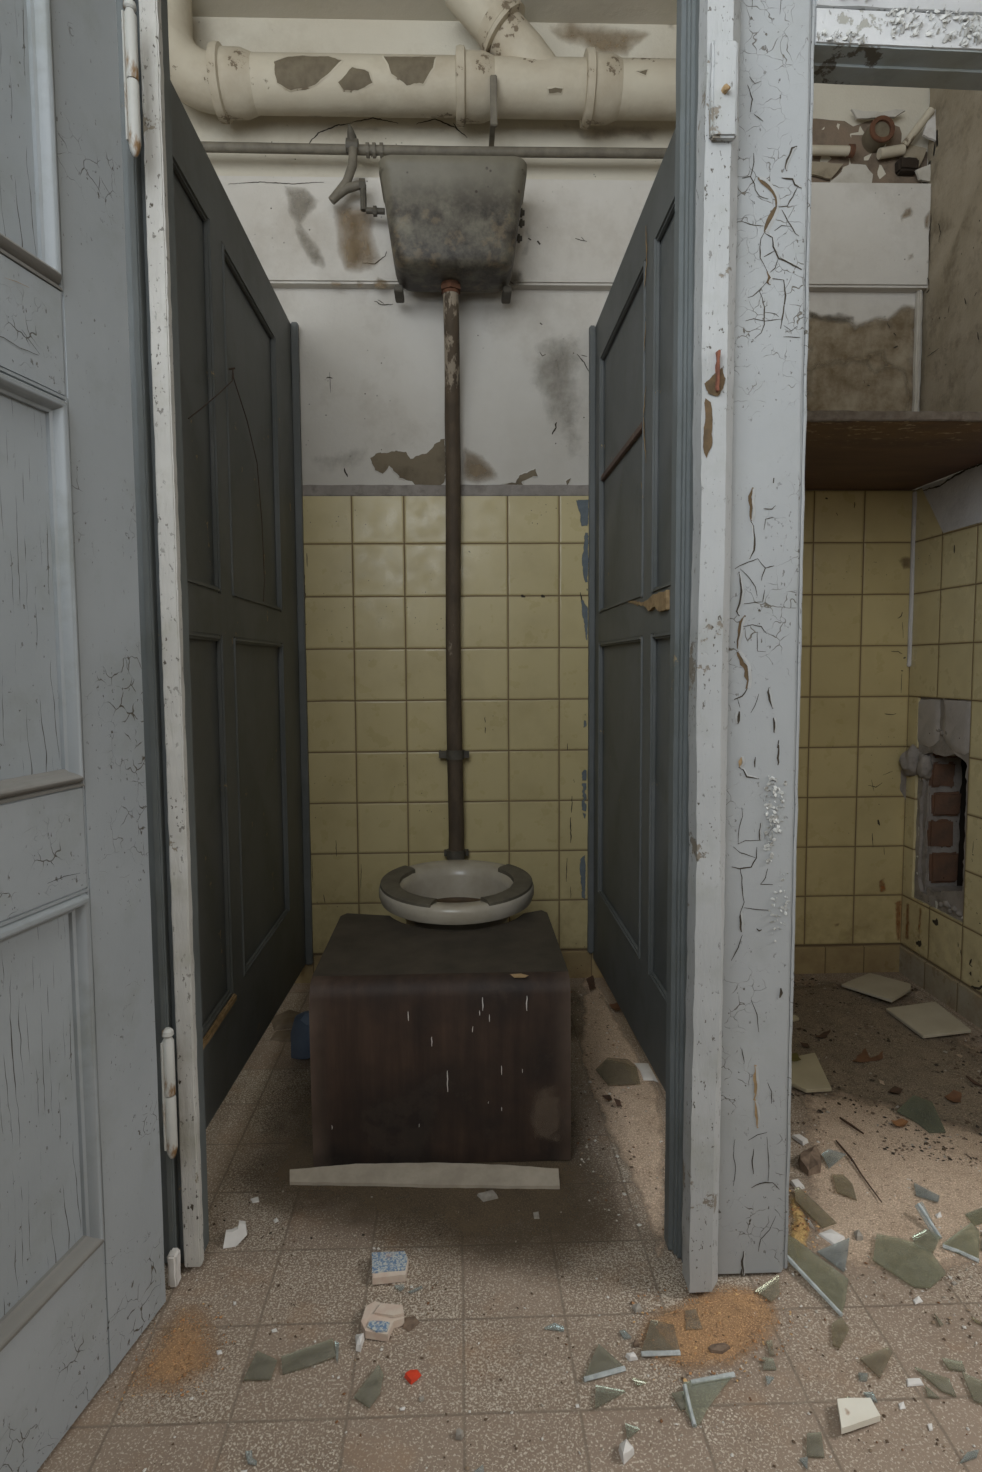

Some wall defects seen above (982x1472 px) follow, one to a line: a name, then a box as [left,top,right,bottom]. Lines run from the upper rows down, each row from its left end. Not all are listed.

peeling [817,29,867,45]
peeling [885,5,982,47]
crack [741,78,802,339]
peeling [811,88,982,412]
peeling [370,438,446,485]
spalling [500,468,539,485]
crack [734,478,779,779]
crack [731,812,773,961]
spalling [868,697,981,926]
crack [733,988,783,1277]